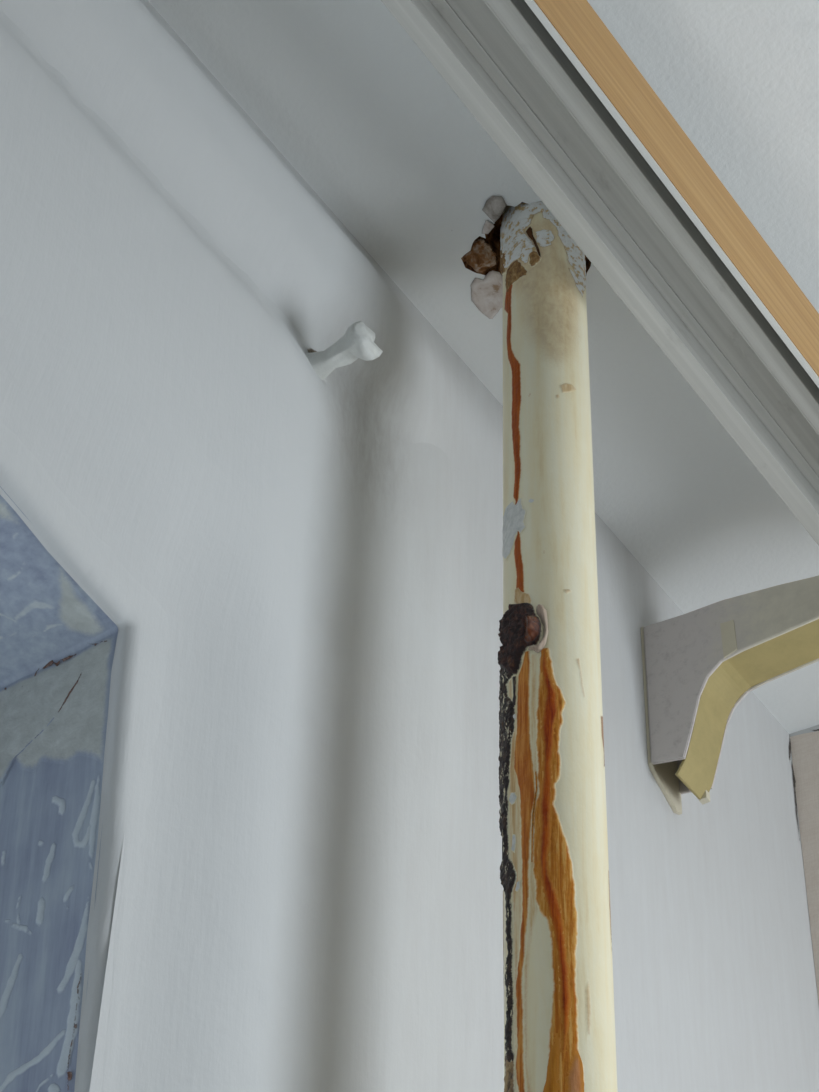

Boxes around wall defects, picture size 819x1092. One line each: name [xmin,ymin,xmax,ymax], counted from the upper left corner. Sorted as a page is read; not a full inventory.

peeling [461,196,591,319]
corrosion [502,212,584,505]
corrosion [513,531,525,592]
corrosion [498,647,592,1092]